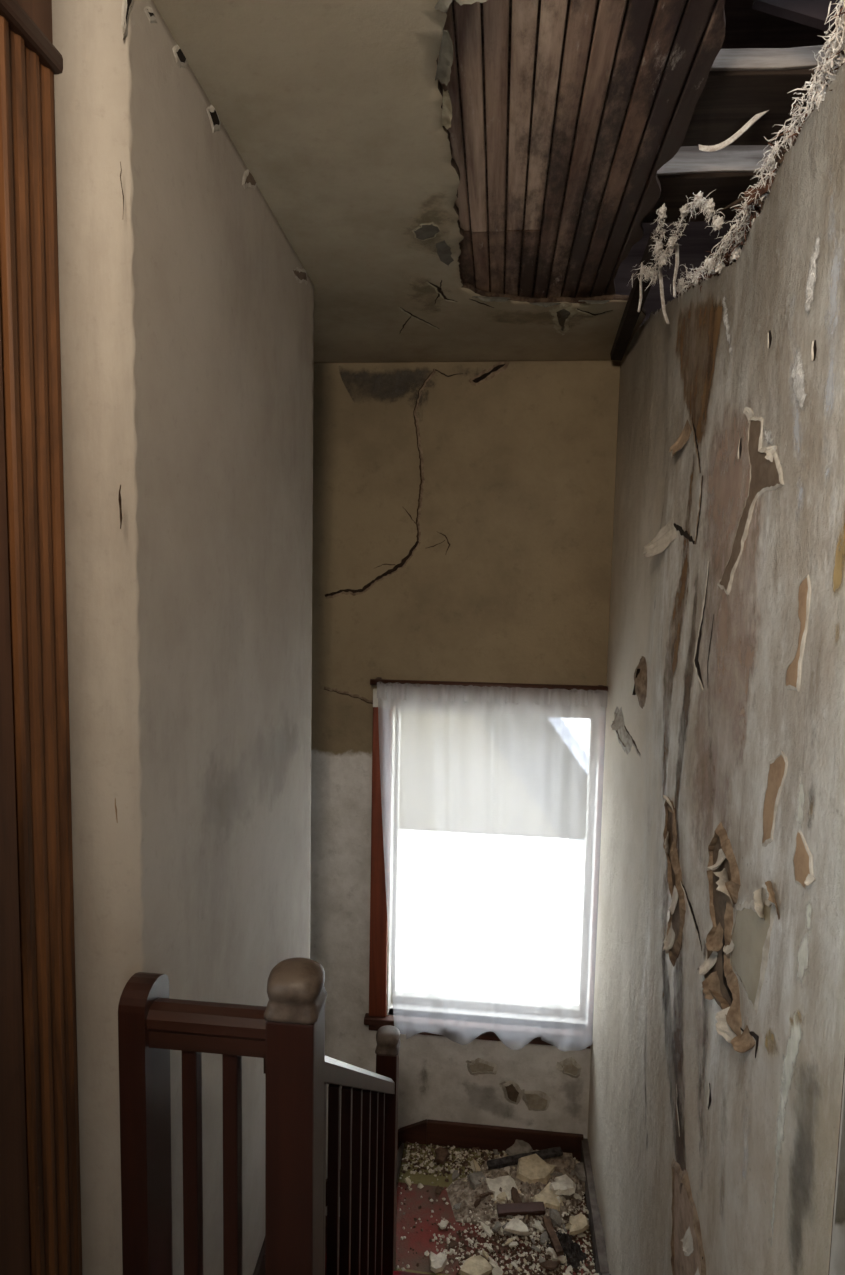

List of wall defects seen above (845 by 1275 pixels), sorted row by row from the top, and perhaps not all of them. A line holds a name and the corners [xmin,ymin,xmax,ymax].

crack [397,280,494,333]
crack [325,369,463,599]
peeling [718,407,784,595]
peeling [785,574,811,692]
peeling [611,707,641,758]
peeling [762,750,788,847]
peeling [662,795,686,967]
peeling [697,822,780,1036]
peeling [792,831,816,890]
peeling [466,1058,551,1111]
peeling [671,1158,706,1275]
damp [835,1143,845,1224]